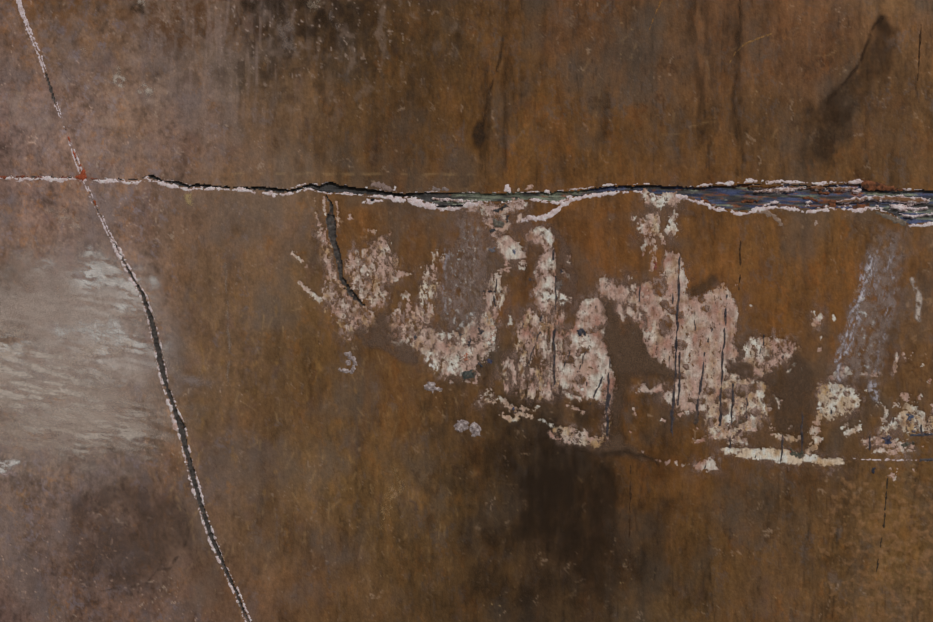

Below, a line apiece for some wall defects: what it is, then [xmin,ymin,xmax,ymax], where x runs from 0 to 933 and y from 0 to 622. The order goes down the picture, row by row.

crack [16,0,66,130]
crack [915,24,923,81]
corrosion [61,137,98,181]
crack [0,141,933,622]
peeling [297,188,933,473]